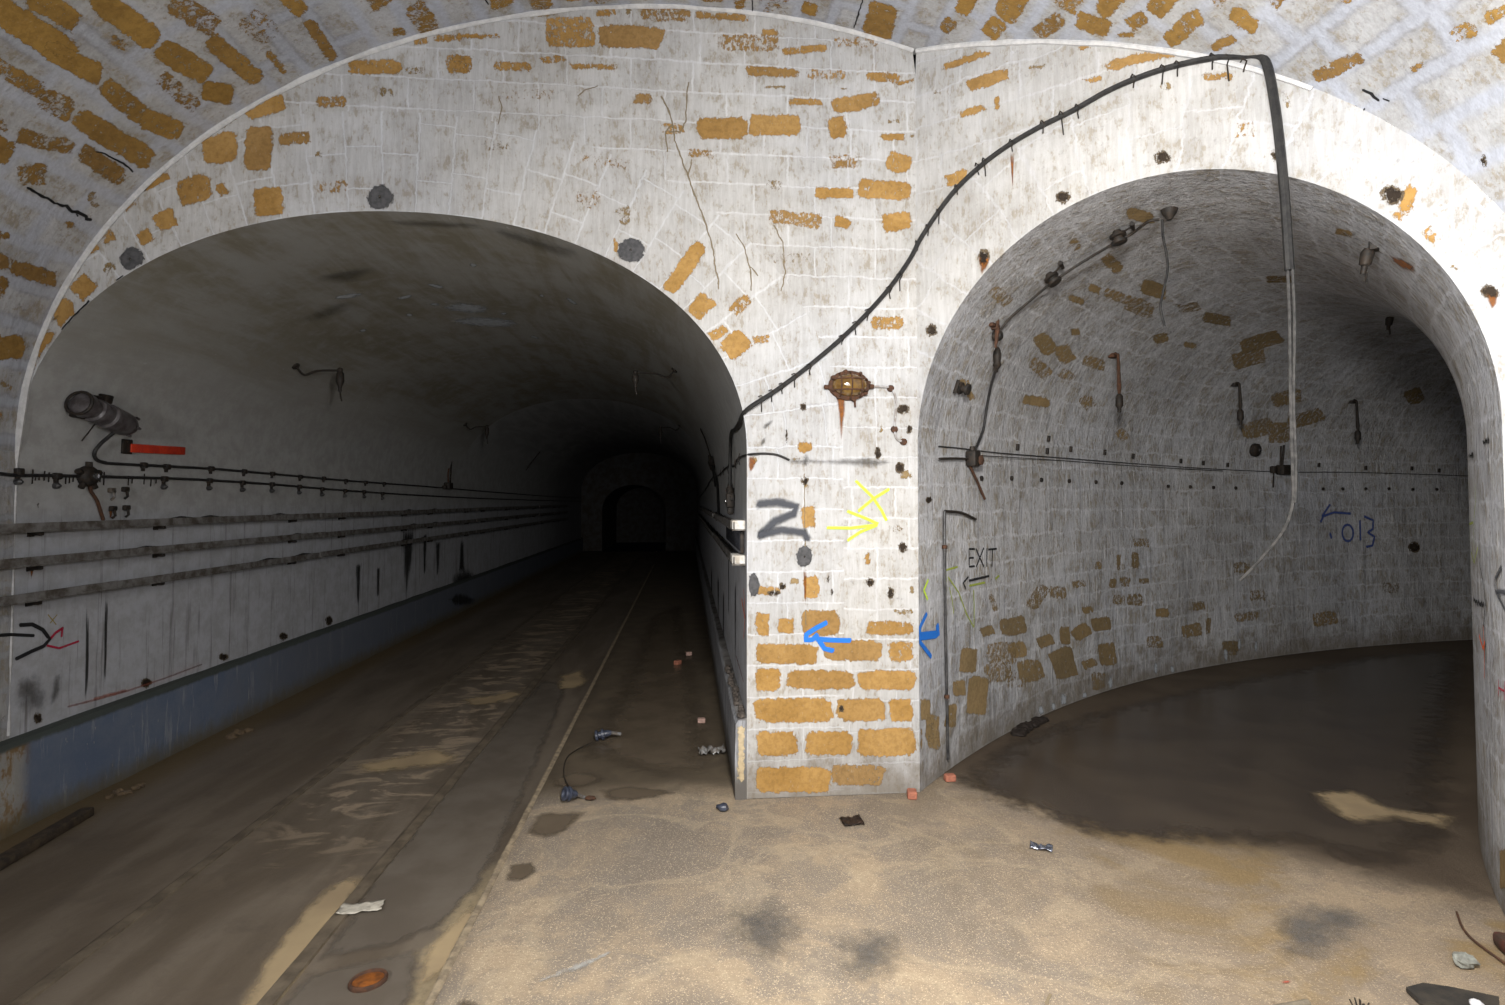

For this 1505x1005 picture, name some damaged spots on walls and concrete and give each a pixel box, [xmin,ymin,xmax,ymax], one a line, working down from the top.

crack [661,82,786,291]
peeling [613,206,630,253]
peeling [988,286,1013,307]
peeling [874,427,912,479]
peeling [1234,589,1266,623]
water stain [85,606,108,694]
peeling [736,538,1239,794]